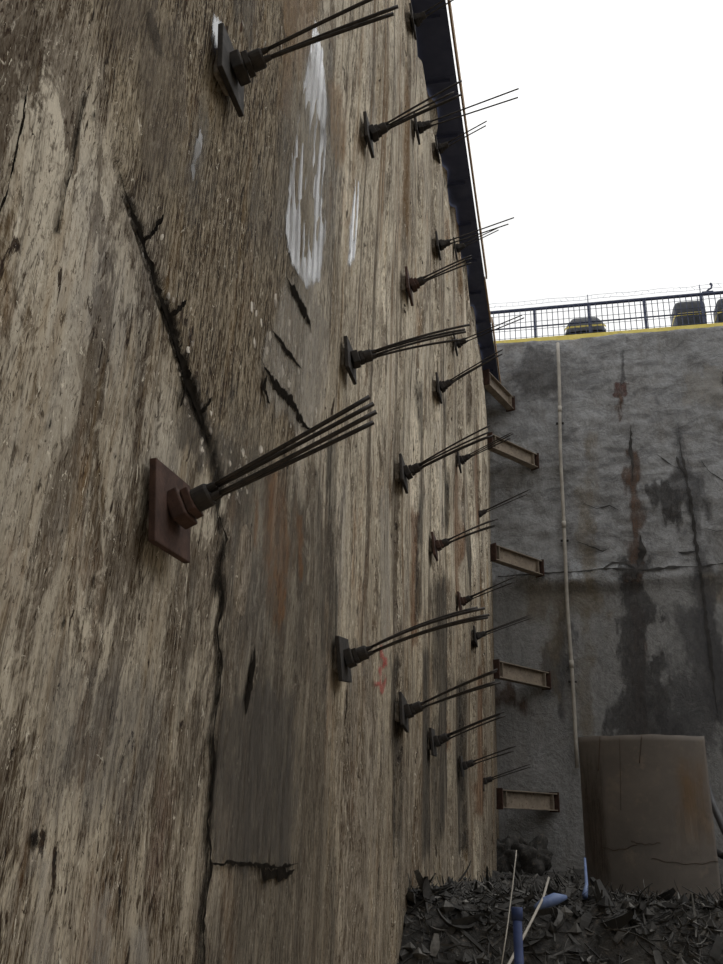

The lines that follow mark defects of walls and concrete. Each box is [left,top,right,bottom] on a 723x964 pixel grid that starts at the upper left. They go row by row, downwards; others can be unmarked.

crack [0,5,42,212]
crack [117,165,228,964]
crack [498,429,723,721]
rust [613,353,647,582]
water stain [602,557,723,747]
water stain [645,480,687,526]